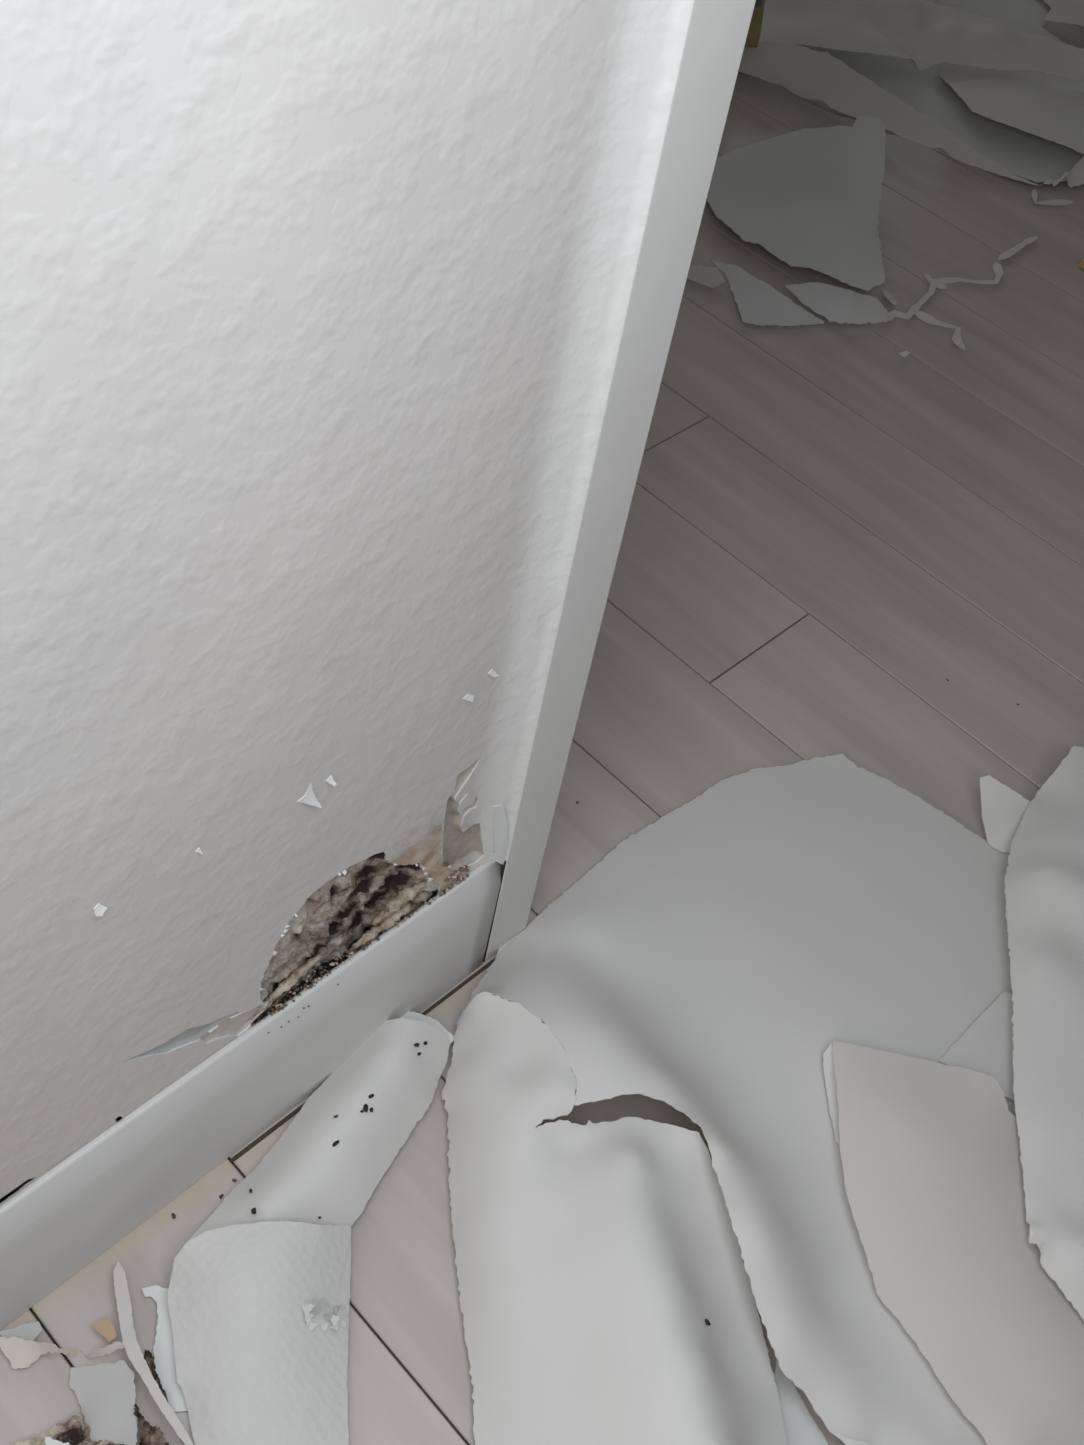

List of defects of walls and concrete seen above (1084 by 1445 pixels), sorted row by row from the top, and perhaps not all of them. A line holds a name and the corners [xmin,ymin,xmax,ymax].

spalling [200,760,483,1043]